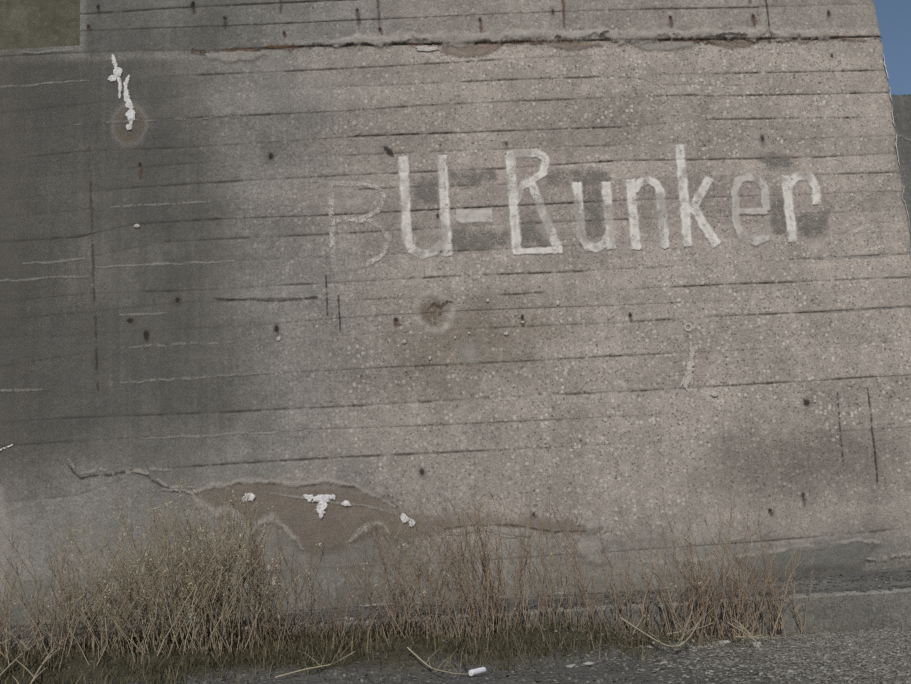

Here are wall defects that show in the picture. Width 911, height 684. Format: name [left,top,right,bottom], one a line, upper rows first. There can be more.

crack [191,25,882,54]
damp [98,54,179,237]
damp [0,59,43,451]
crack [68,459,195,491]
damp [0,486,12,606]